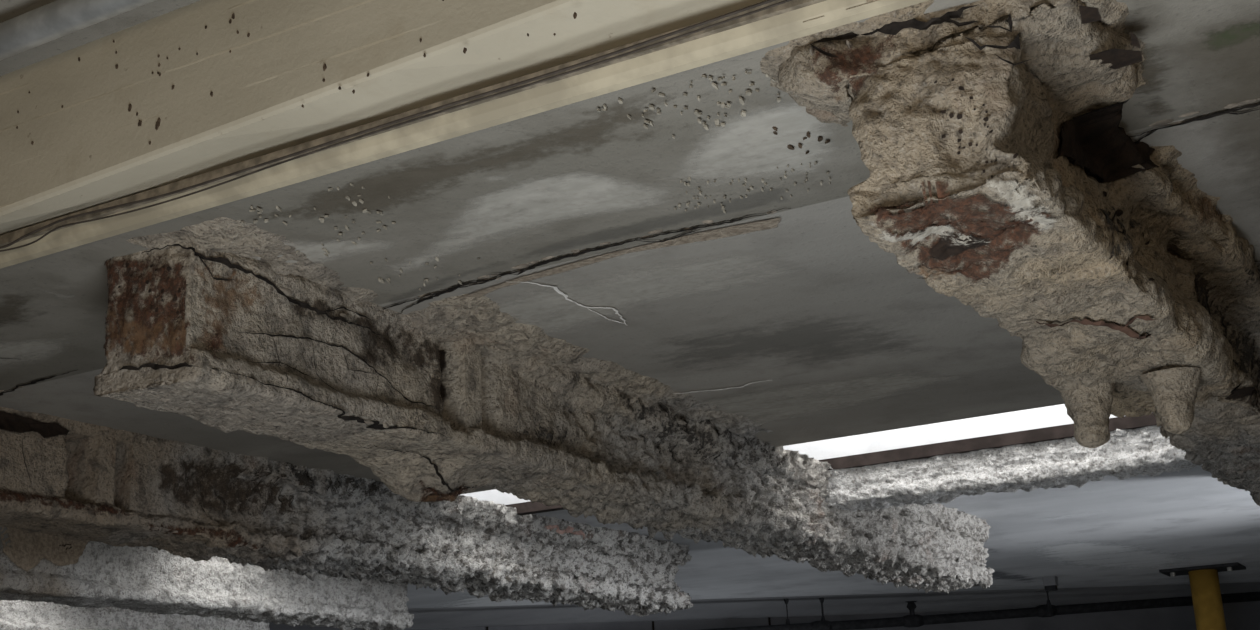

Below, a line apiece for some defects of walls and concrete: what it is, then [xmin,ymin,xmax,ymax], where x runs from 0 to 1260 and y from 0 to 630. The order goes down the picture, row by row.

crack [966,14,1031,65]
damp [278,242,385,263]
damp [273,107,650,218]
damp [401,174,662,269]
damp [690,106,824,177]
corrosion [869,200,924,222]
corrosion [986,180,1040,203]
spalling [1056,101,1159,245]
corrosion [103,255,271,363]
crack [0,358,76,396]
crack [120,208,784,492]
peeling [25,422,69,439]